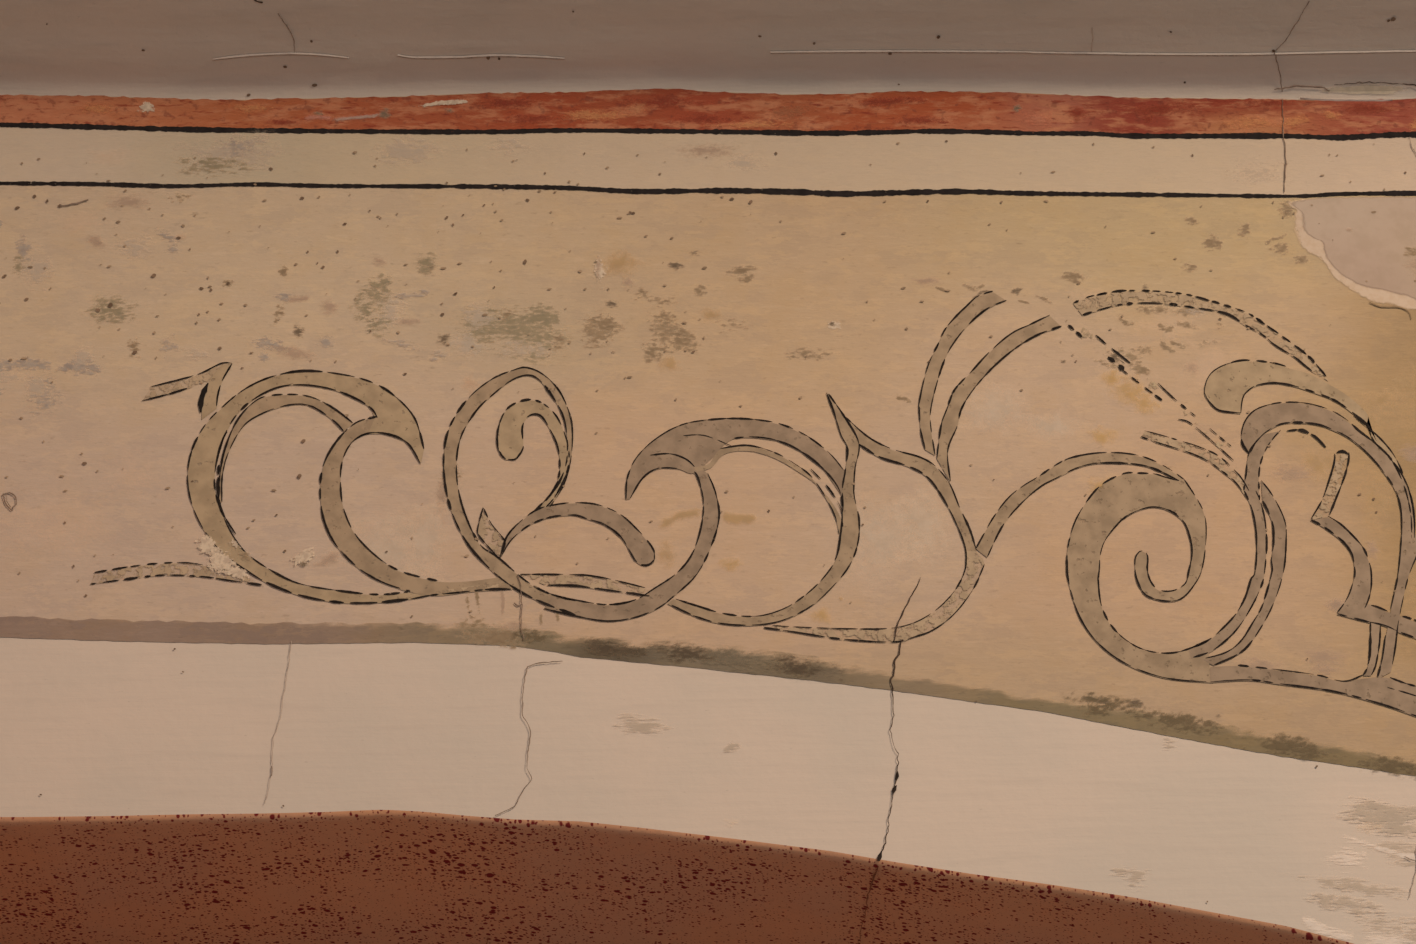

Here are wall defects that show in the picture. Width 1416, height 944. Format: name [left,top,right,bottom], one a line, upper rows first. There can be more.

crack [1067,1,1416,192]
damp [355,252,436,349]
damp [430,301,621,363]
damp [609,256,698,367]
peeling [1289,197,1416,319]
crack [265,641,292,801]
crack [495,574,560,816]
damp [584,639,646,657]
crack [858,579,920,944]
damp [1067,692,1223,735]
damp [1262,733,1320,759]
damp [1360,754,1416,775]